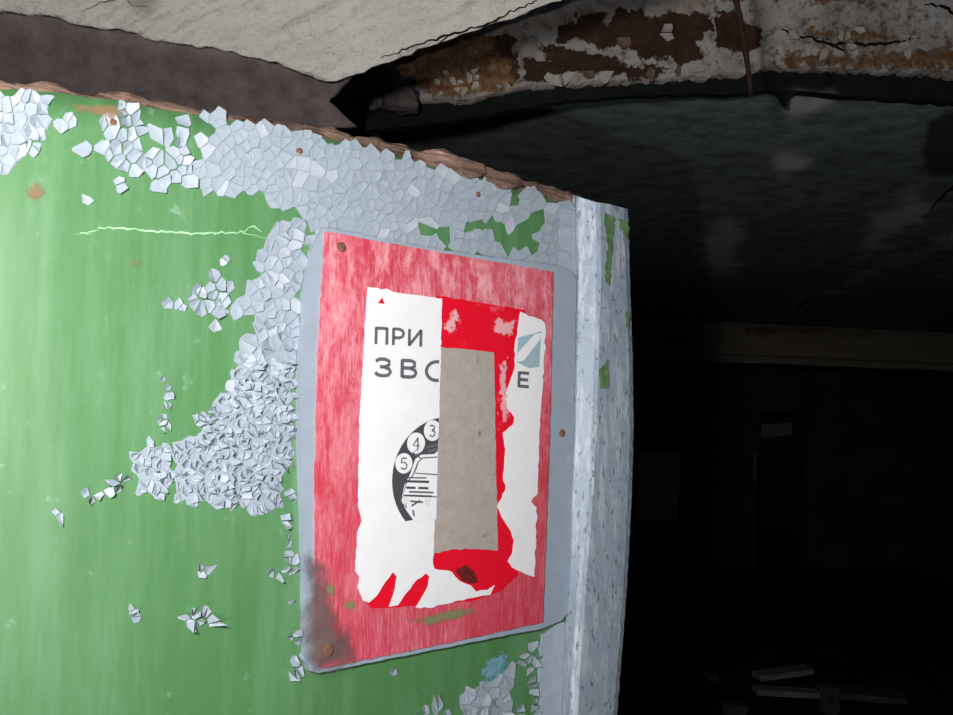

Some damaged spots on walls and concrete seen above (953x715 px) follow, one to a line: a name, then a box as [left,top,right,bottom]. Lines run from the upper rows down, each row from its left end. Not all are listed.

crack [82,0,148,12]
crack [924,2,953,15]
rust [393,32,520,98]
peeling [434,67,479,98]
spalling [485,0,763,87]
crack [781,29,920,52]
peeling [0,88,77,175]
peeling [72,100,576,583]
peeling [128,604,141,623]
peeling [178,605,226,633]
peeling [287,629,306,681]
peeling [423,641,544,715]